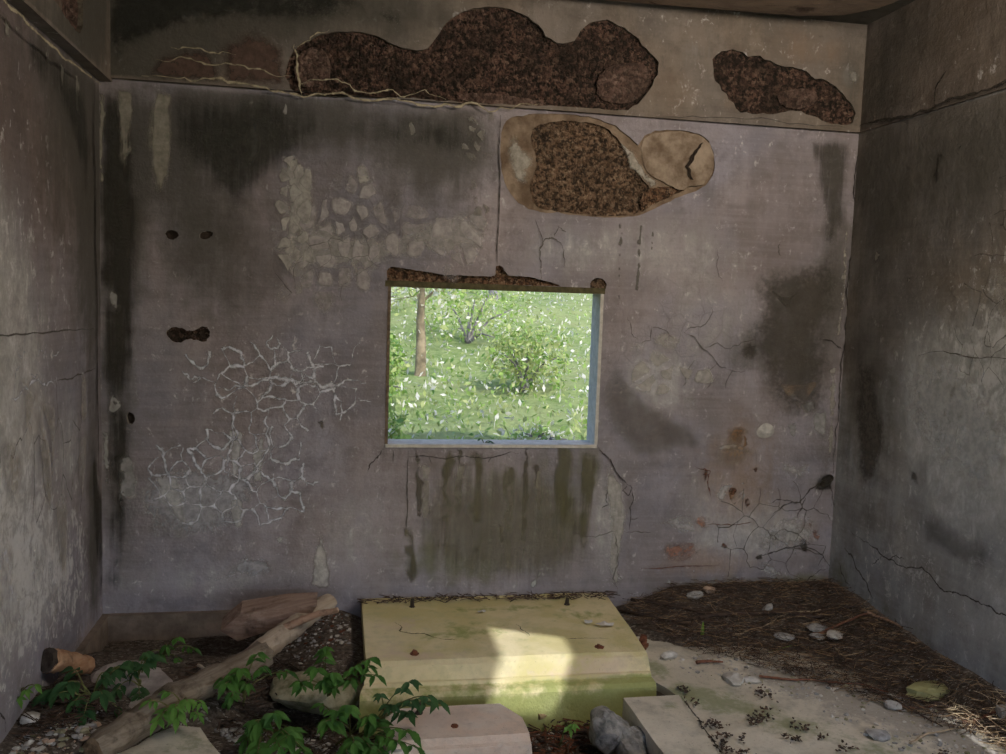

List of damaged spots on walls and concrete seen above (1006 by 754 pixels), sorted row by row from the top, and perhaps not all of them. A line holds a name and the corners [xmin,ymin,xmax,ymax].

spalling [147,7,715,218]
spalling [712,49,856,125]
crack [0,98,99,528]
damp [94,90,371,563]
flaking render [275,156,559,311]
spalling [590,278,607,289]
damp [745,268,835,453]
crack [629,156,1006,616]
damp [406,531,416,580]
damp [416,448,595,587]
crack [570,449,651,589]